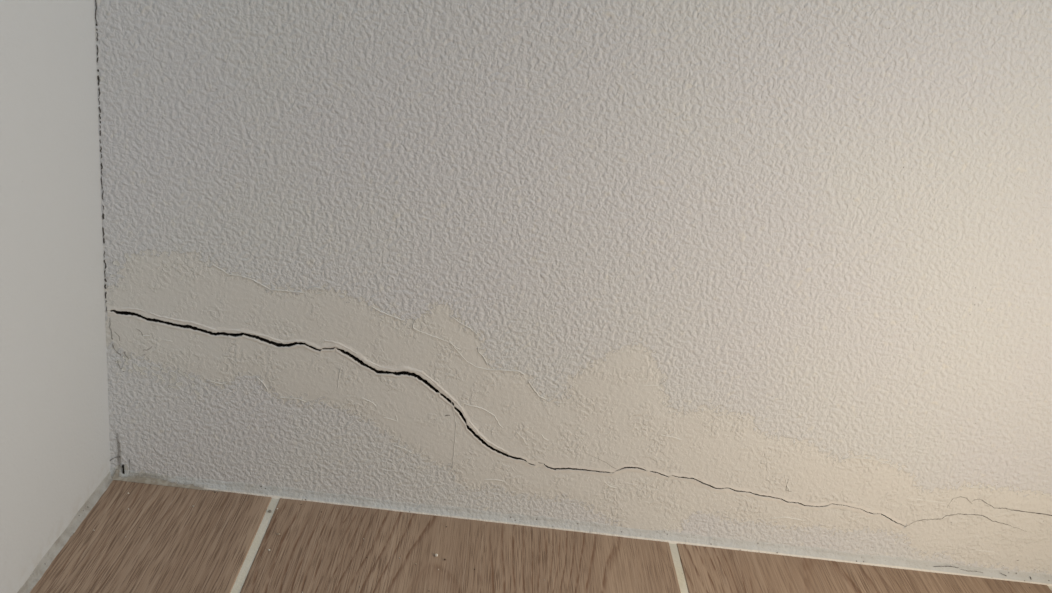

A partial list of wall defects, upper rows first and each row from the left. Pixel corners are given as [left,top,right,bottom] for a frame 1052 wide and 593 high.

crack [95,0,1024,531]
crack [973,499,1052,516]